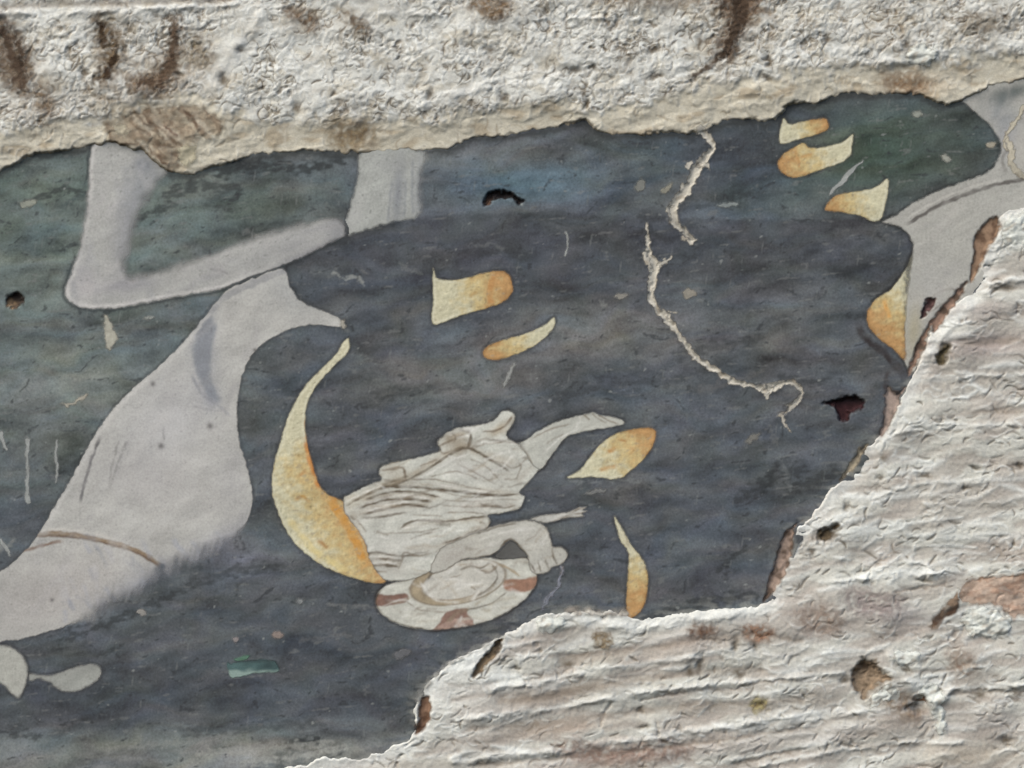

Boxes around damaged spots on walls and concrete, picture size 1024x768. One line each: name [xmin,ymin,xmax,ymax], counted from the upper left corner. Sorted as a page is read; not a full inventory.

spalling [104,105,223,173]
crack [643,124,803,431]
spalling [908,216,1001,375]
peeling [104,315,118,350]
spalling [879,387,906,436]
spalling [763,524,796,602]
spalling [930,573,1024,629]
peeling [227,655,279,678]
spalling [415,636,504,734]